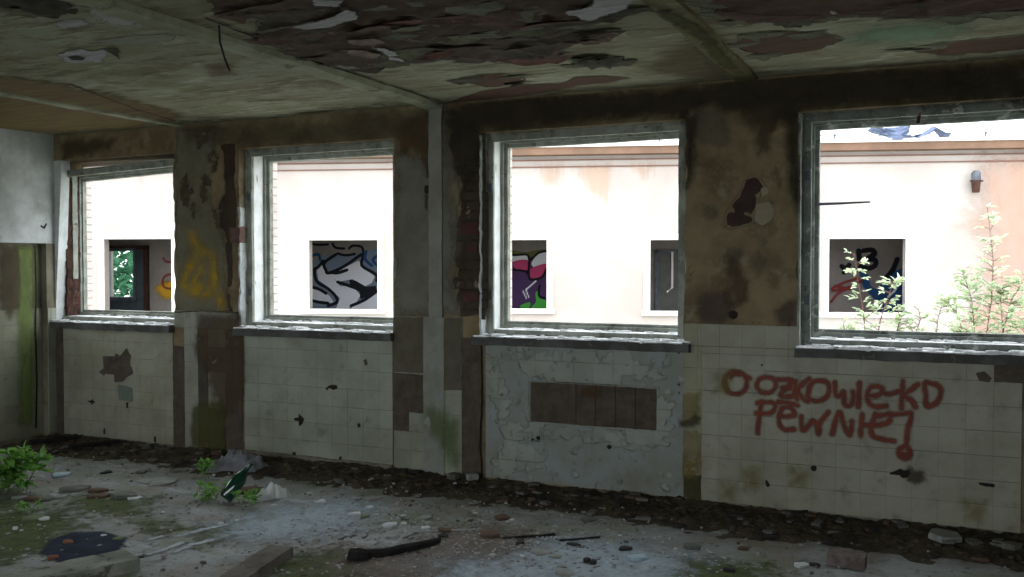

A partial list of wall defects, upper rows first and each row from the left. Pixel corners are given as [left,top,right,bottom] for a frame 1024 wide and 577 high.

peeling [57,48,122,65]
peeling [206,0,638,102]
peeling [677,0,1024,62]
spalling [180,143,246,312]
spalling [723,173,775,246]
peeling [434,120,702,506]
water stain [700,256,747,322]
spalling [99,348,133,408]
peeling [110,346,185,454]